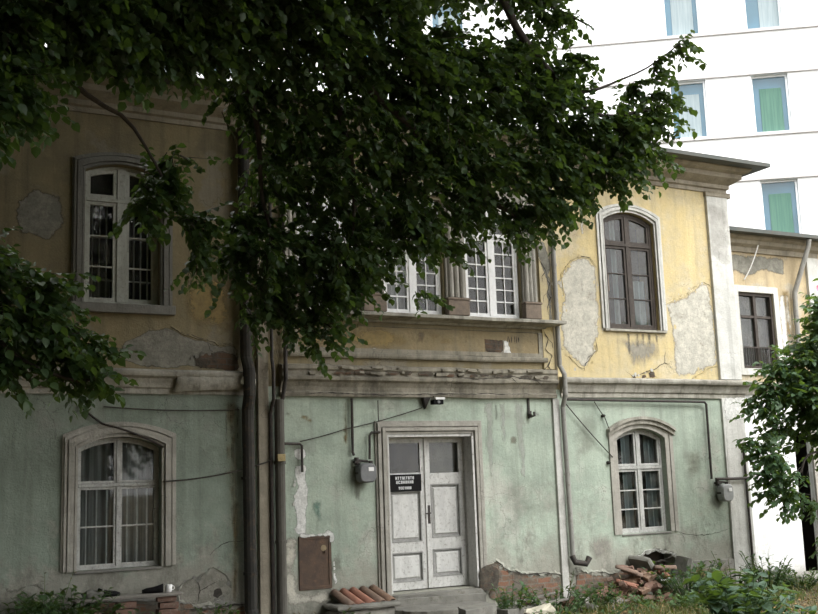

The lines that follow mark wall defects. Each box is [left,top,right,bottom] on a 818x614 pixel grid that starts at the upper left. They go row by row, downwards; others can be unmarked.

flaking render [732,254,784,275]
flaking render [552,254,604,371]
water stain [626,334,658,362]
flaking render [666,281,718,379]
spalling [328,366,548,380]
crack [187,575,245,611]
flaking render [286,538,331,605]
spalling [479,558,561,602]
spalling [574,565,633,597]
spalling [637,546,678,581]